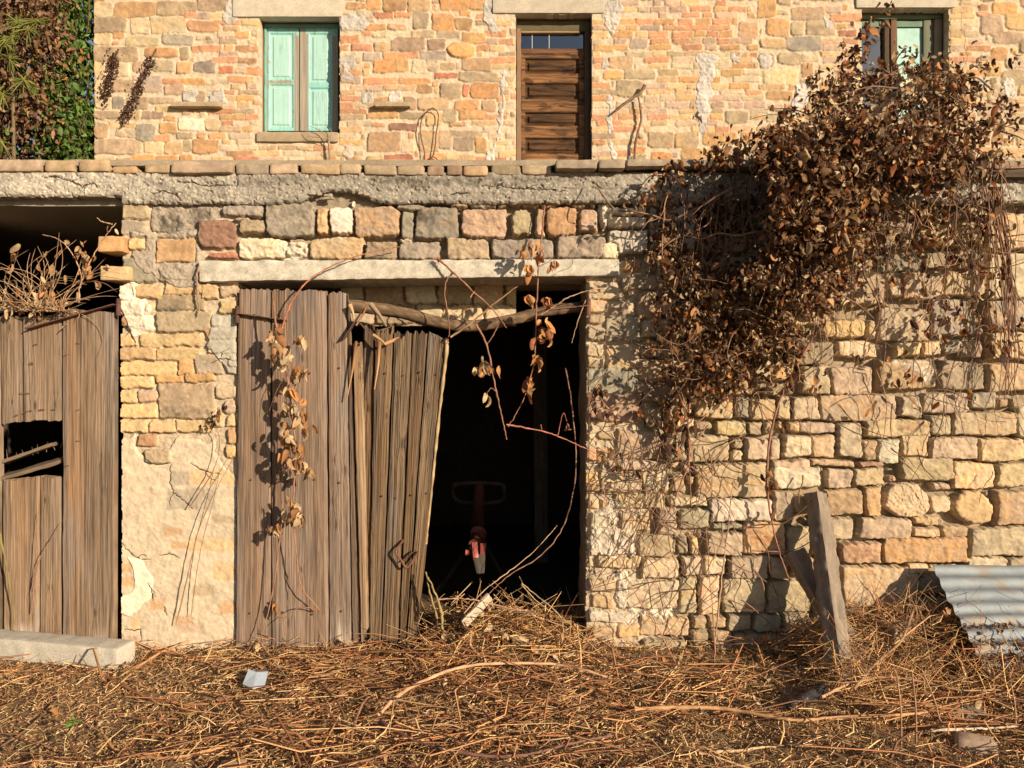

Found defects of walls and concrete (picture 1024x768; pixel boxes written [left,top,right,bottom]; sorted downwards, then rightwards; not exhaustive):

crack [143,455,219,509]